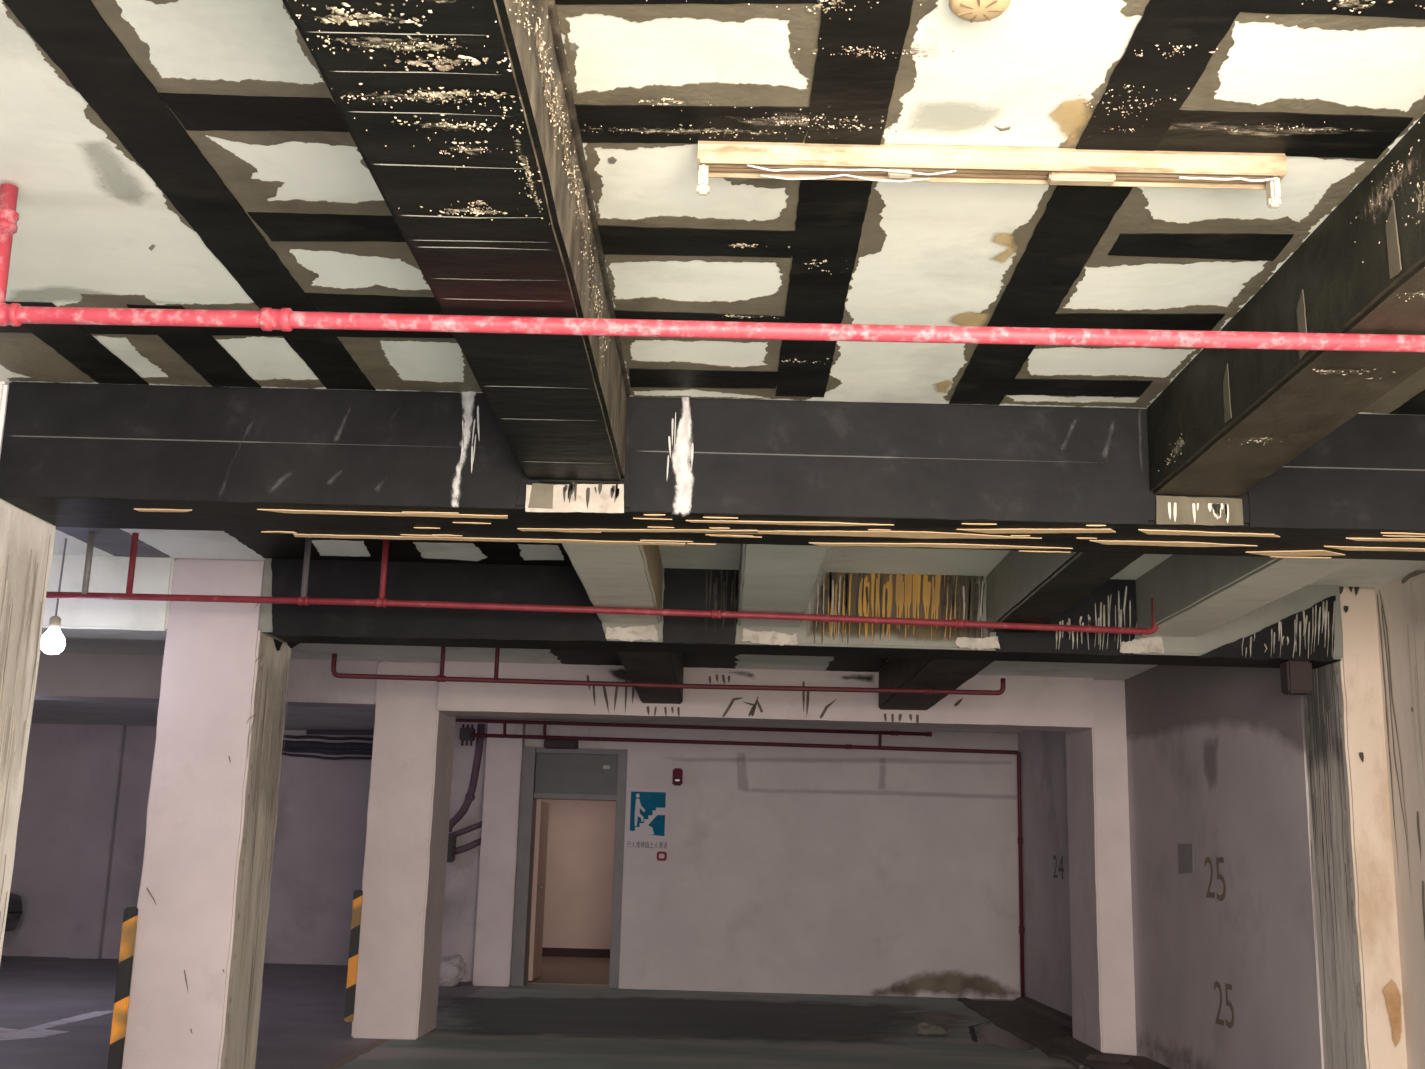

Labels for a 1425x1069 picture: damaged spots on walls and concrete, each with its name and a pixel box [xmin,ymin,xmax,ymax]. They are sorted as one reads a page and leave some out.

water stain [0,539,50,939]
water stain [1124,586,1364,1069]
water stain [1377,570,1425,940]